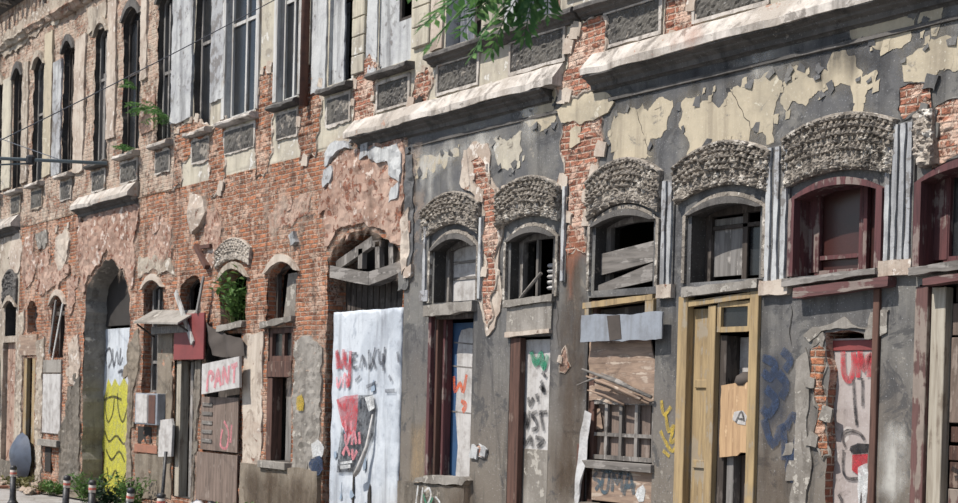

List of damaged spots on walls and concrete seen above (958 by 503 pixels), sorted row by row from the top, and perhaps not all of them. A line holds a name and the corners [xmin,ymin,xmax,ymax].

flaking render [663,0,697,34]
flaking render [254,61,275,179]
flaking render [296,63,324,166]
flaking render [350,53,380,122]
flaking render [406,65,435,107]
peeling [850,7,958,169]
flaking render [318,165,333,214]
peeling [405,144,459,180]
peeling [470,15,880,328]
flaking render [398,264,414,291]
flaking render [864,310,890,339]
flaking render [782,332,834,481]